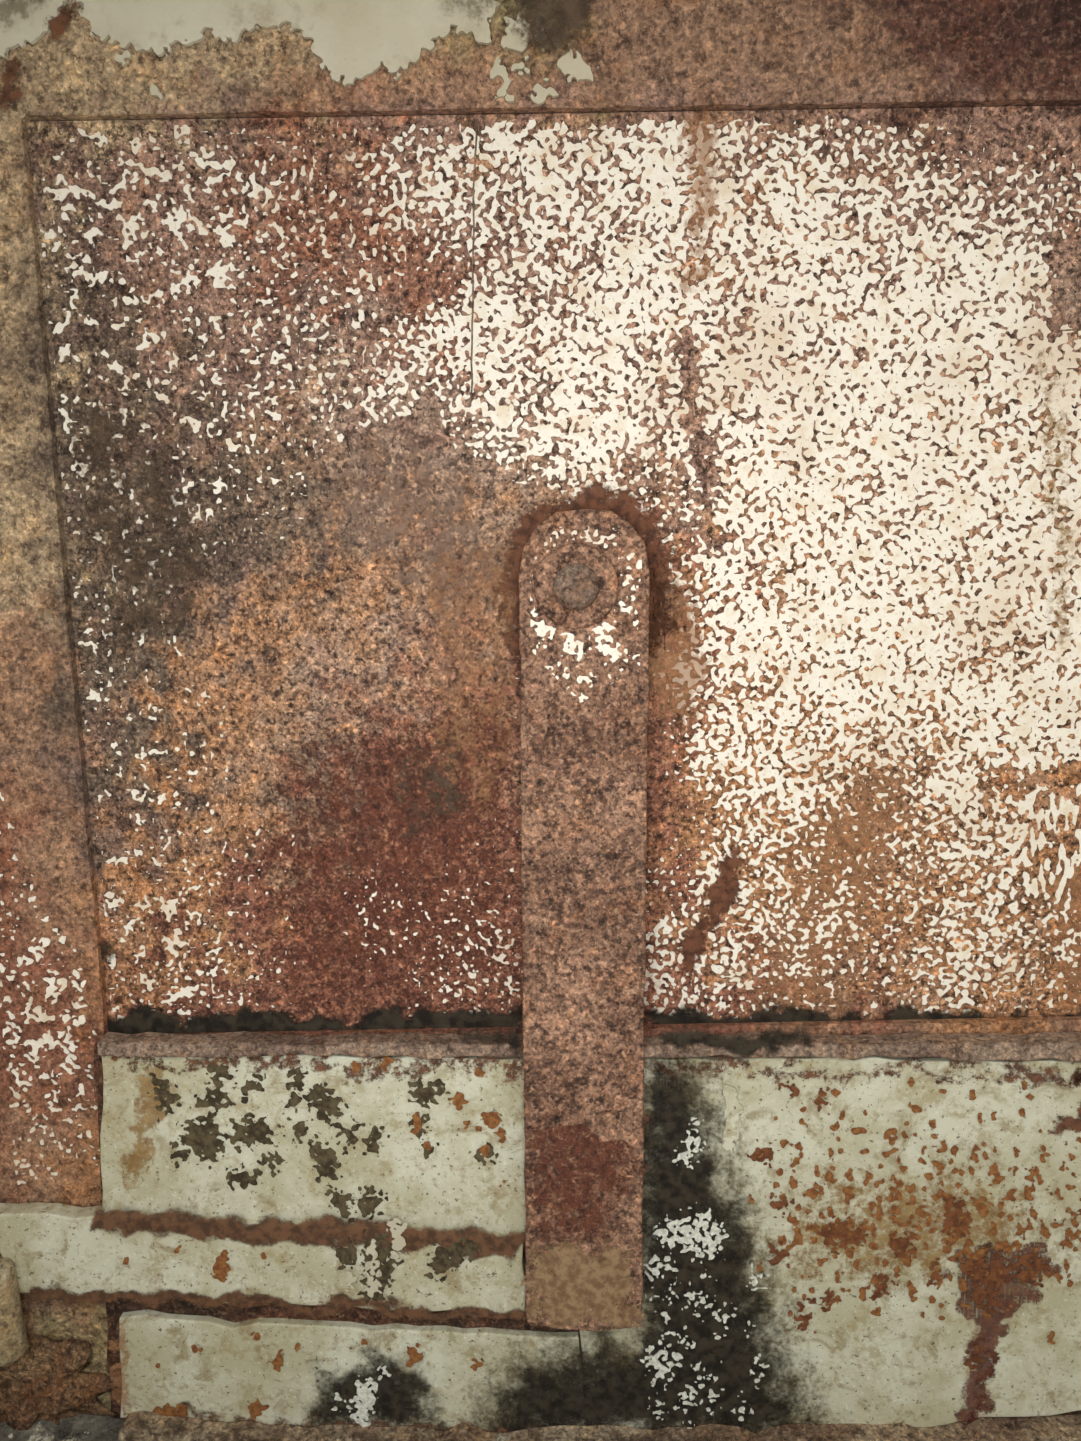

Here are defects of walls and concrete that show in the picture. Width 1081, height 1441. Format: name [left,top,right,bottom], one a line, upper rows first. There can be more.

water stain [0,0,43,23]
peeling [0,0,1081,1024]
corrosion [493,481,681,670]
peeling [0,854,100,1185]
corrosion [111,701,526,1186]
peeling [147,1058,404,1304]
peeling [407,1072,451,1160]
peeling [474,1140,499,1169]
corrosion [643,1045,1081,1426]
water stain [28,1422,76,1441]
corrosion [152,1399,390,1428]
corrosion [406,1343,423,1368]